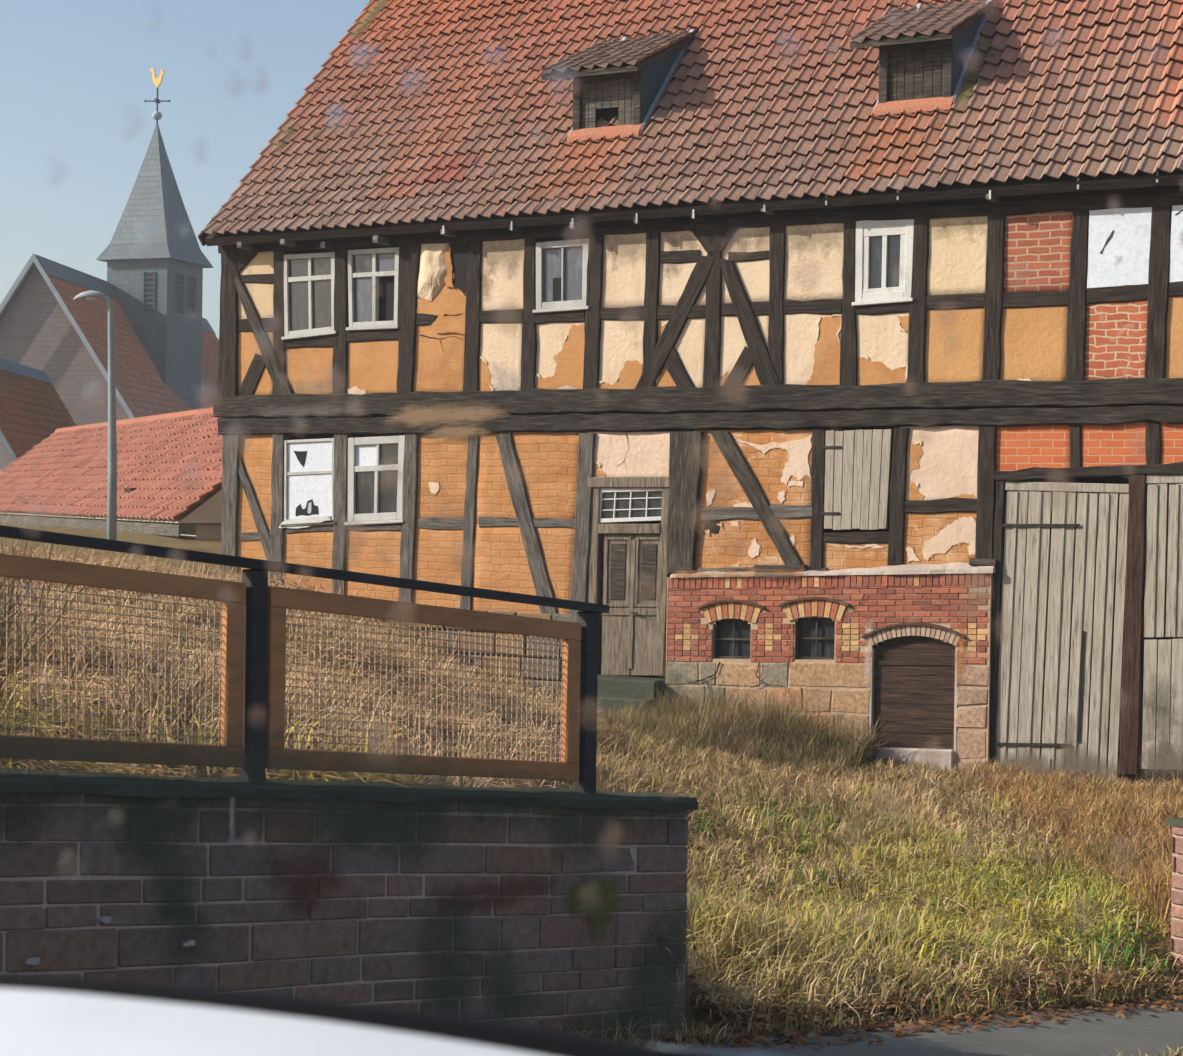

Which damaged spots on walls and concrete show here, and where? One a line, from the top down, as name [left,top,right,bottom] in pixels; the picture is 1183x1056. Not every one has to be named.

spalling [449,241,468,296]
flaking render [479,357,494,391]
flaking render [535,324,585,389]
flaking render [598,360,643,389]
flaking render [656,367,676,387]
flaking render [806,314,842,385]
flaking render [857,355,908,385]
peeling [735,435,812,504]
flaking render [908,441,925,500]
peeling [706,488,716,506]
peeling [748,538,762,558]
peeling [905,516,976,562]